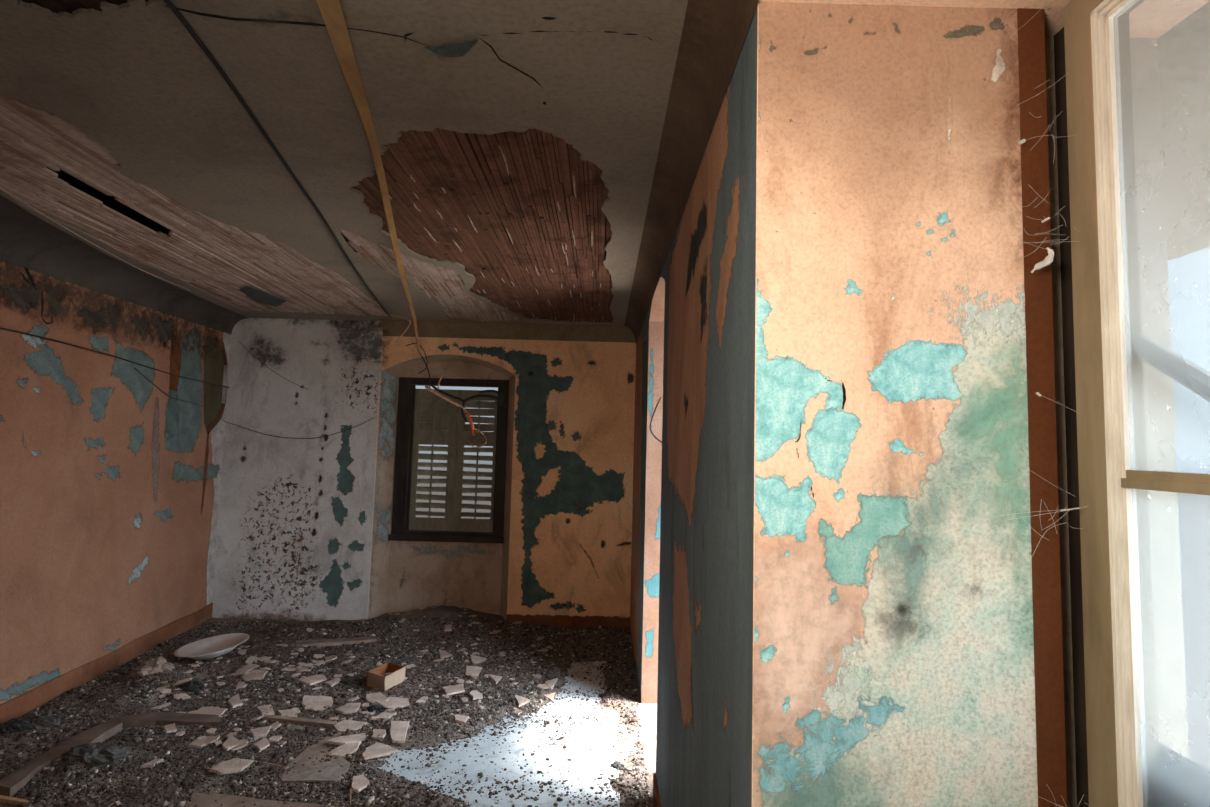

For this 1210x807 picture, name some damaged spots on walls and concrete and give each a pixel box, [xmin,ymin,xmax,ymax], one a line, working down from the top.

crack [166,6,430,47]
crack [479,17,652,105]
peeling [17,322,155,456]
damp [0,260,218,357]
flaking render [164,328,231,605]
damp [233,413,328,612]
peeling [319,372,398,607]
damp [341,368,381,413]
peeling [438,86,739,728]
peeling [755,279,912,604]
damp [761,286,1038,807]
peeling [868,340,967,403]